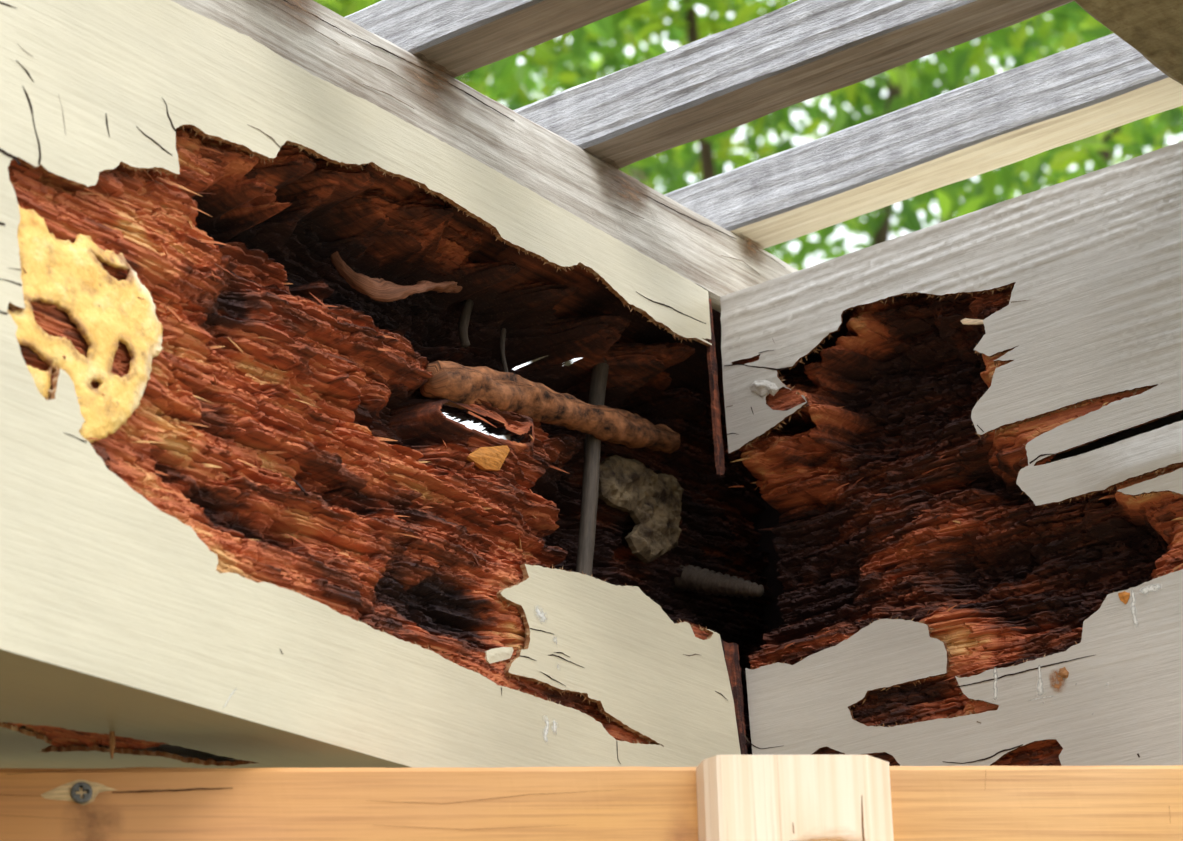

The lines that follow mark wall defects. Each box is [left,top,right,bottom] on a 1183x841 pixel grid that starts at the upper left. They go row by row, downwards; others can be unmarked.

crack [0,48,66,165]
crack [105,97,176,156]
spalling [7,125,1183,755]
peeling [864,753,900,766]
spalling [993,740,1063,766]